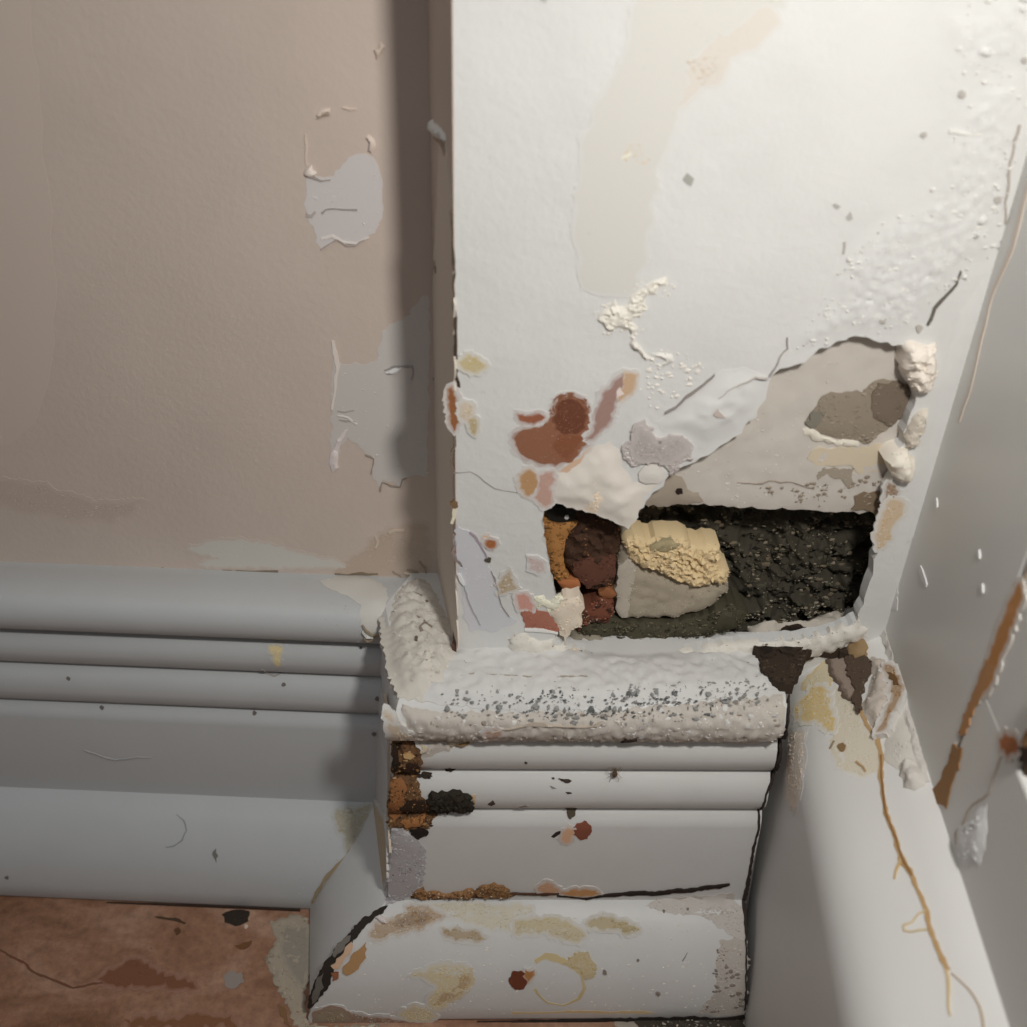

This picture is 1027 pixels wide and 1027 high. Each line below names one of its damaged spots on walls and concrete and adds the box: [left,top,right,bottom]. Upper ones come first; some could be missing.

peeling [304,135,384,250]
crack [450,210,460,388]
peeling [328,119,603,648]
spalling [804,379,911,445]
flaking render [555,442,876,632]
corrosion [932,576,1027,809]
peeling [375,828,427,924]
peeling [551,808,592,846]
crack [411,694,790,1011]
crack [860,704,984,1027]
crack [954,756,1003,845]
peeling [509,966,538,990]